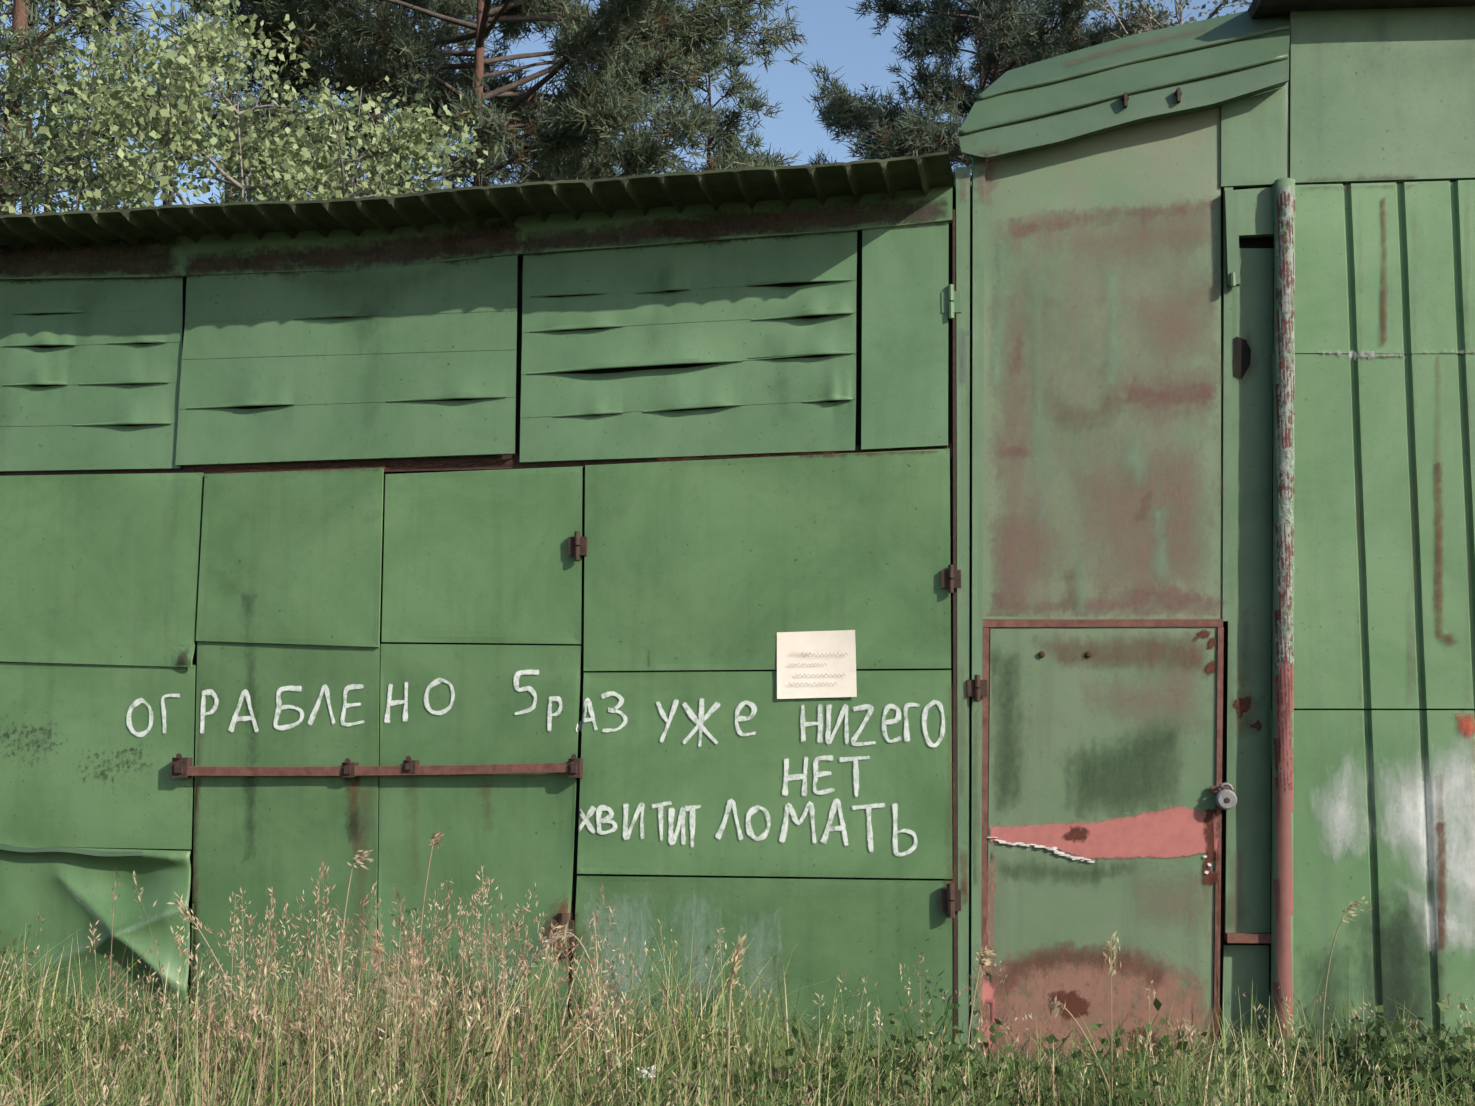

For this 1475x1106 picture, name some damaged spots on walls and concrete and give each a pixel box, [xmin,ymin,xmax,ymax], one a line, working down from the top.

rust [1436,464,1454,642]
rust [1194,630,1216,675]
rust [1458,716,1475,737]
peeling [979,806,1219,1067]
rust [1048,991,1088,1018]